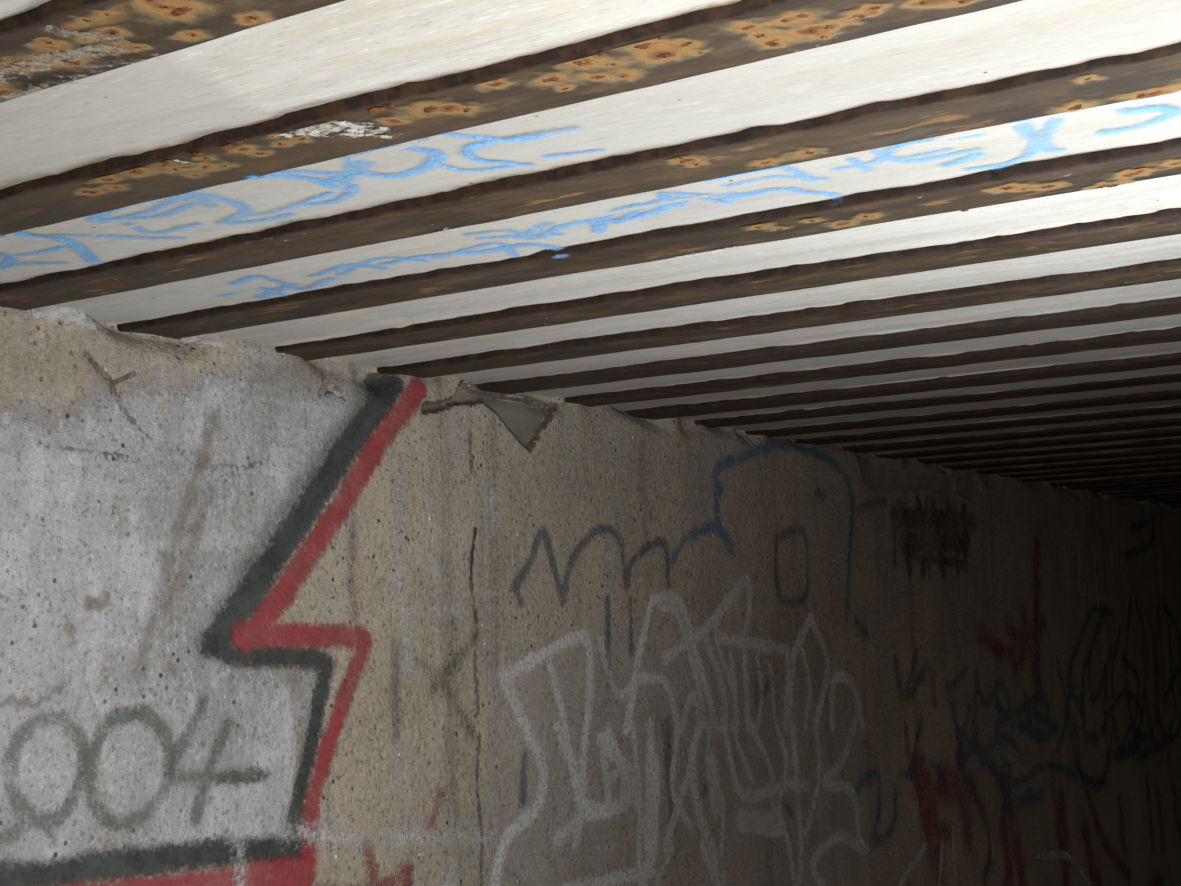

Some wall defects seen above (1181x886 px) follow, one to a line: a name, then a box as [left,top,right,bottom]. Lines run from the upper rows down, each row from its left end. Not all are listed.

efflorescence [0,25,145,99]
corrosion [0,0,212,100]
efflorescence [278,121,392,138]
corrosion [368,101,482,125]
corrosion [476,78,514,90]
corrosion [531,36,710,92]
corrosion [726,0,981,49]
corrosion [1055,101,1097,113]
corrosion [1120,83,1181,101]
corrosion [74,130,334,196]
spalling [422,380,558,453]
crack [469,528,477,581]